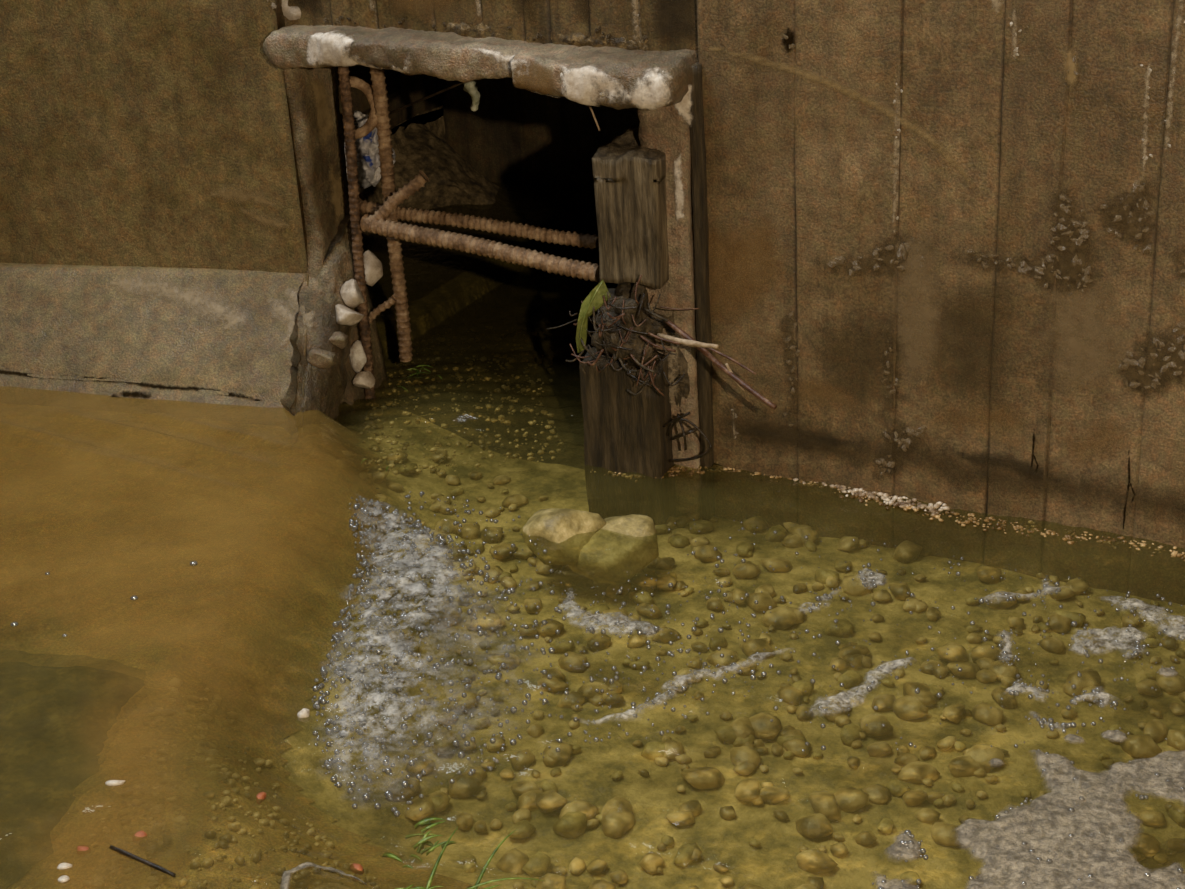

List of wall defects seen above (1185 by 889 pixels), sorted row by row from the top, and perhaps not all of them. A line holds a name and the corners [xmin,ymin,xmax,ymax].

spalling [432,19,527,70]
spalling [527,26,648,51]
rust [515,62,550,95]
peeling [560,66,692,125]
peeling [674,156,684,221]
peeling [110,276,246,330]
spalling [268,168,355,423]
leakage [729,409,1185,518]